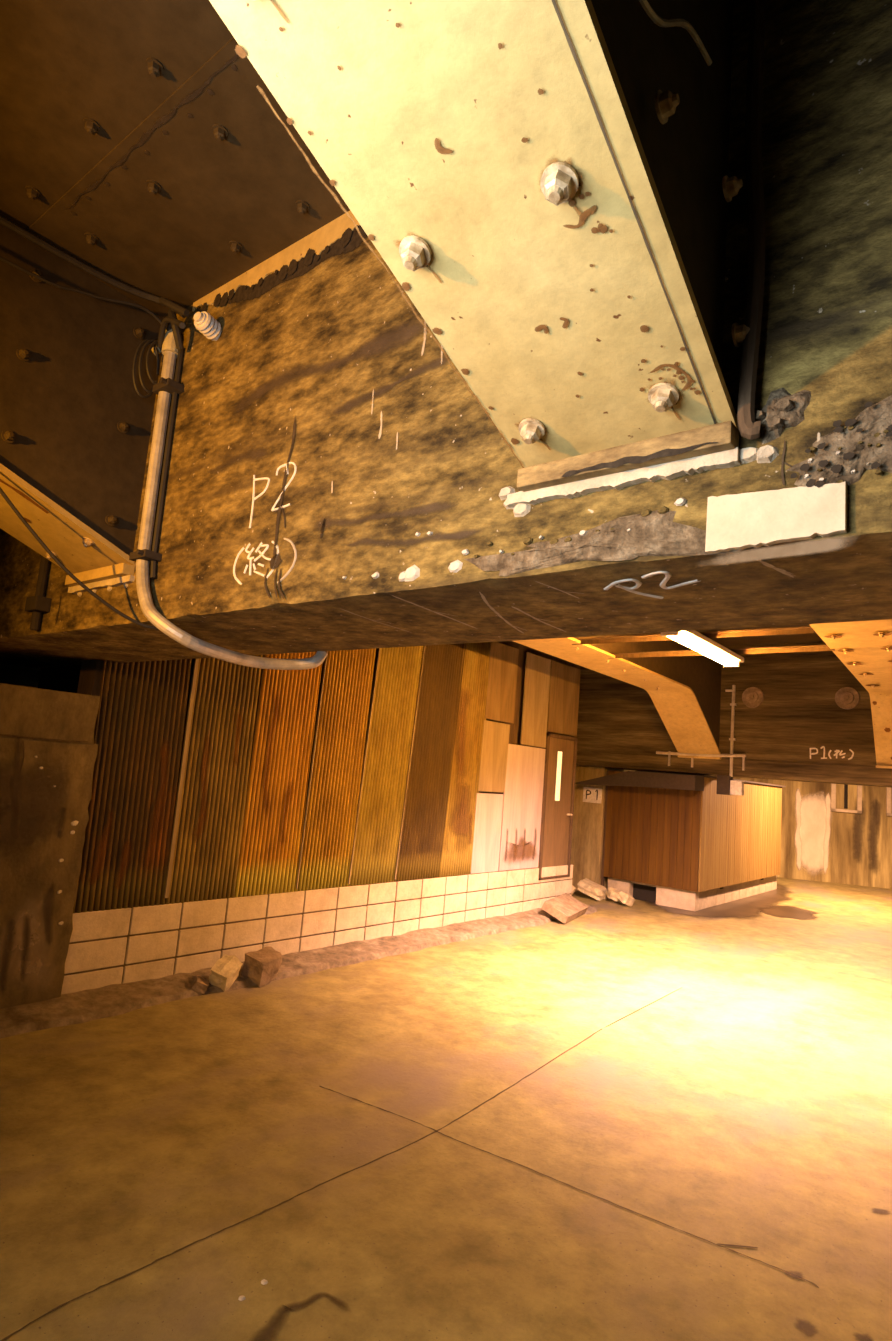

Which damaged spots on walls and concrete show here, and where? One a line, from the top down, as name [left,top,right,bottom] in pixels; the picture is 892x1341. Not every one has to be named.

peeling [499,387,811,517]
spalling [786,395,892,488]
spalling [399,565,420,582]
spalling [448,498,741,576]
leakage [795,789,831,872]
leakage [854,801,880,870]
leakage [1,917,29,991]